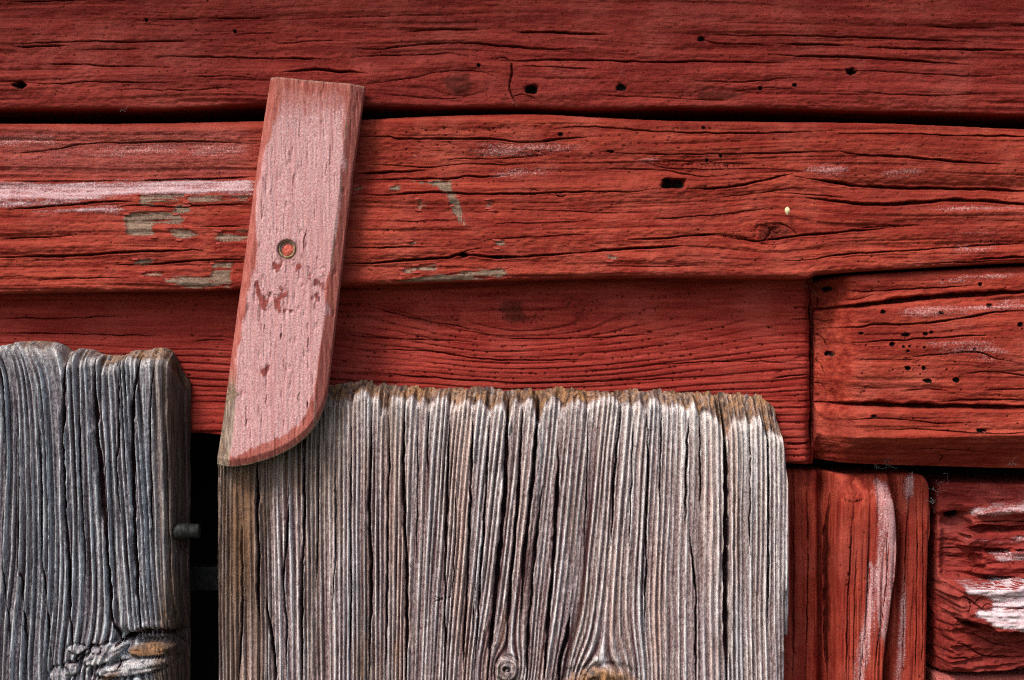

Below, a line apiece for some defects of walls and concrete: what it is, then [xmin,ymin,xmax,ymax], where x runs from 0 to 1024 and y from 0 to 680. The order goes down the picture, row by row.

crack [2,316,187,680]
crack [238,293,923,680]